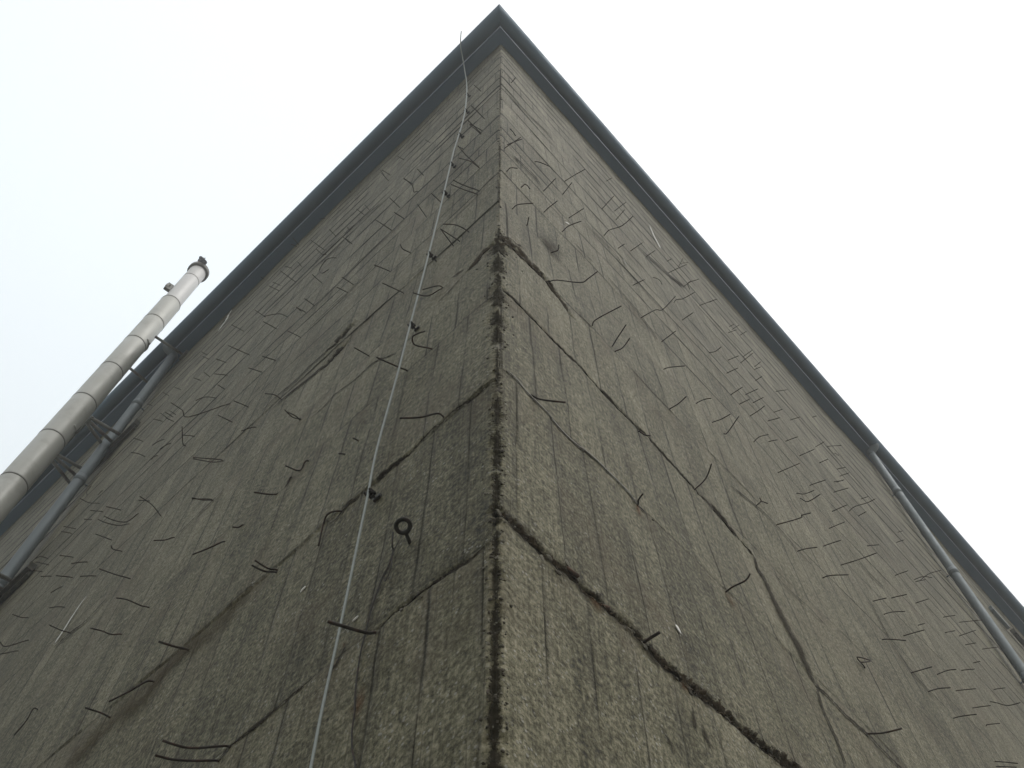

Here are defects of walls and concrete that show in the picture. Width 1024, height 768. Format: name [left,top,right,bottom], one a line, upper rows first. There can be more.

crack [579,232,684,340]
crack [313,354,394,416]
crack [331,388,486,523]
crack [503,289,823,622]